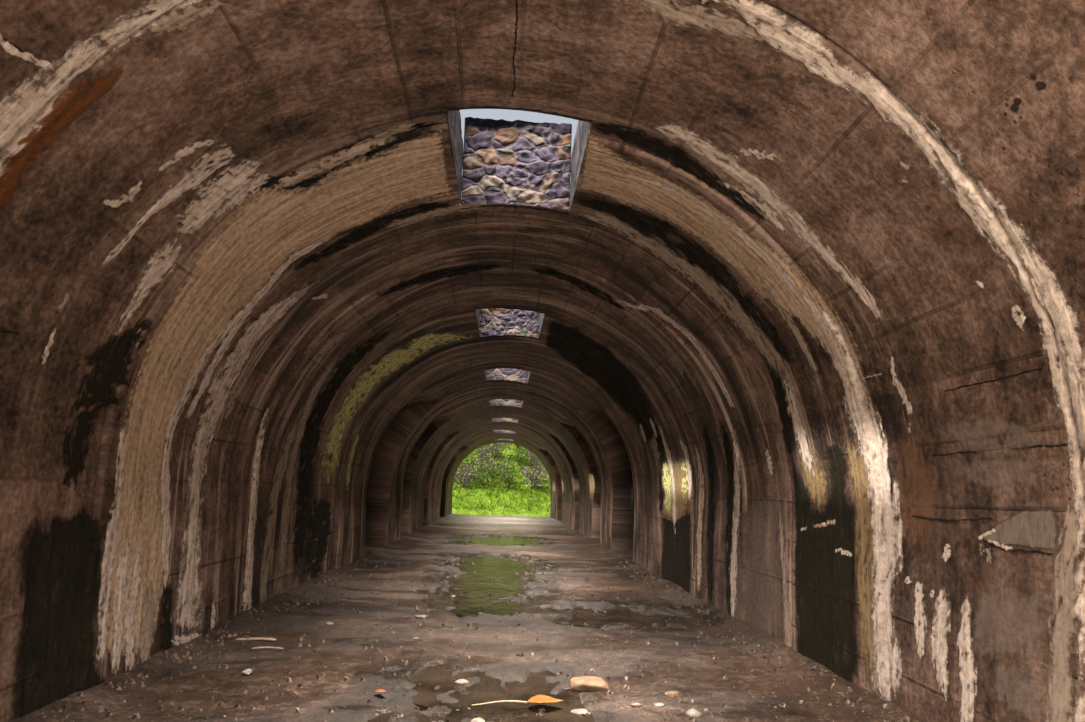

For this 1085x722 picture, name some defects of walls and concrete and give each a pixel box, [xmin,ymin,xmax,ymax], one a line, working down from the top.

crack [0,33,54,69]
damp [0,0,225,177]
crack [510,0,518,97]
damp [13,123,501,719]
damp [532,269,735,409]
damp [579,0,1085,722]